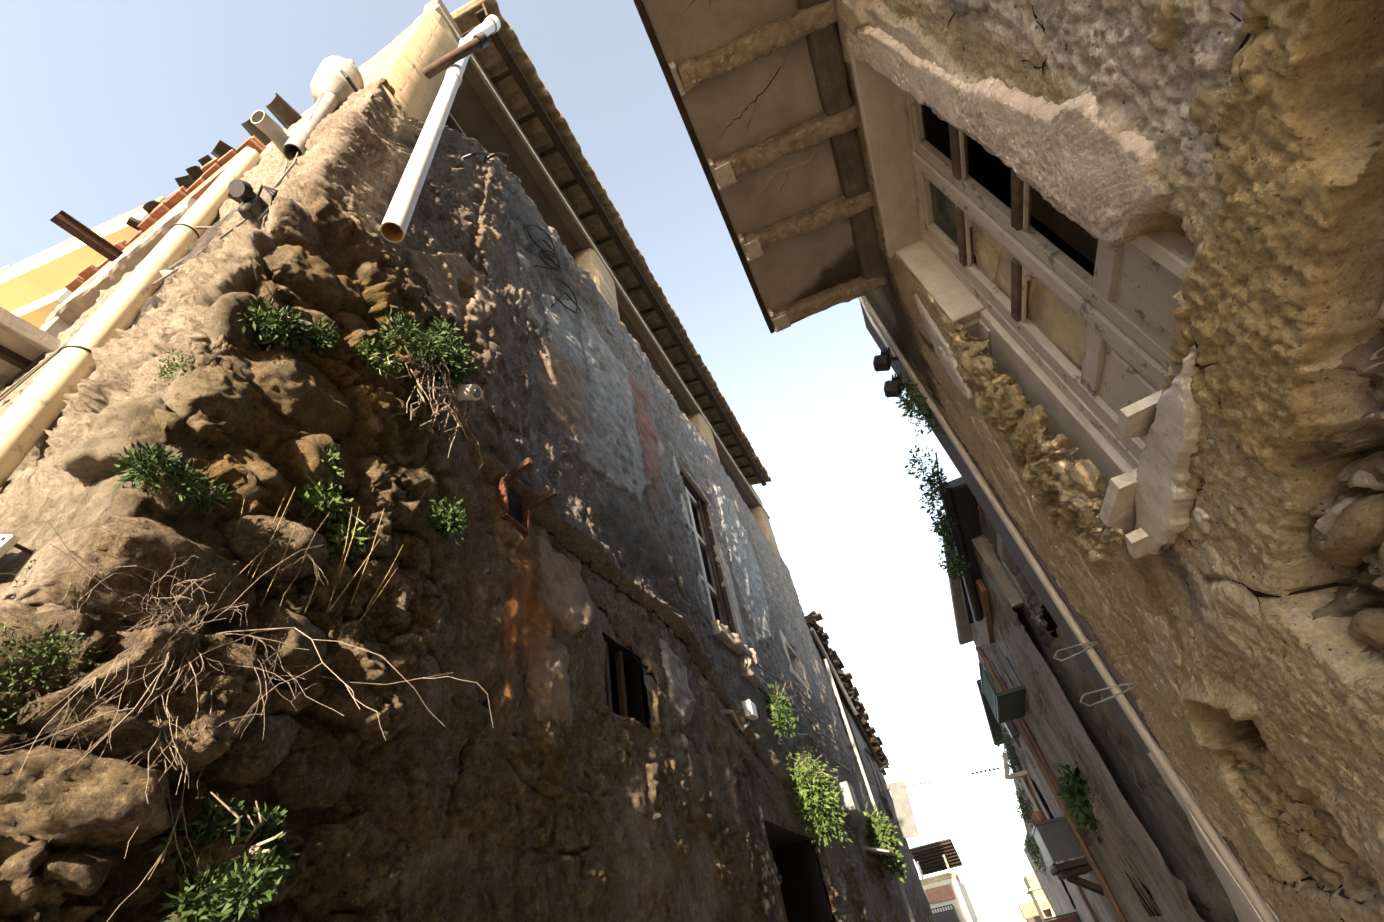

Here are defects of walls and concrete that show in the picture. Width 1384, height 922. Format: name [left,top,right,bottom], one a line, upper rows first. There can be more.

crack [720,45,793,137]
spalling [1189,85,1227,136]
spalling [914,293,1108,531]
peeling [1134,290,1210,554]
spalling [1305,327,1384,659]
spalling [1196,720,1384,899]